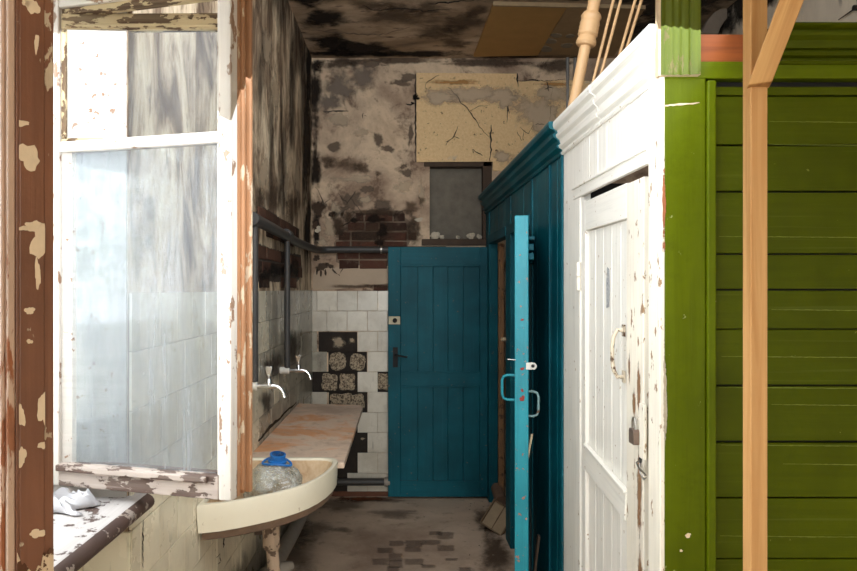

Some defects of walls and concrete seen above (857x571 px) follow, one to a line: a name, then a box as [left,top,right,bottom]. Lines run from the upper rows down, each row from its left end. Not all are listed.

peeling [22,0,40,14]
peeling [19,144,40,171]
leakage [256,0,571,276]
crack [406,73,563,162]
peeling [19,220,45,290]
flaking render [315,203,423,269]
peeling [312,332,367,412]
peeling [378,372,388,392]
peeling [334,427,368,491]